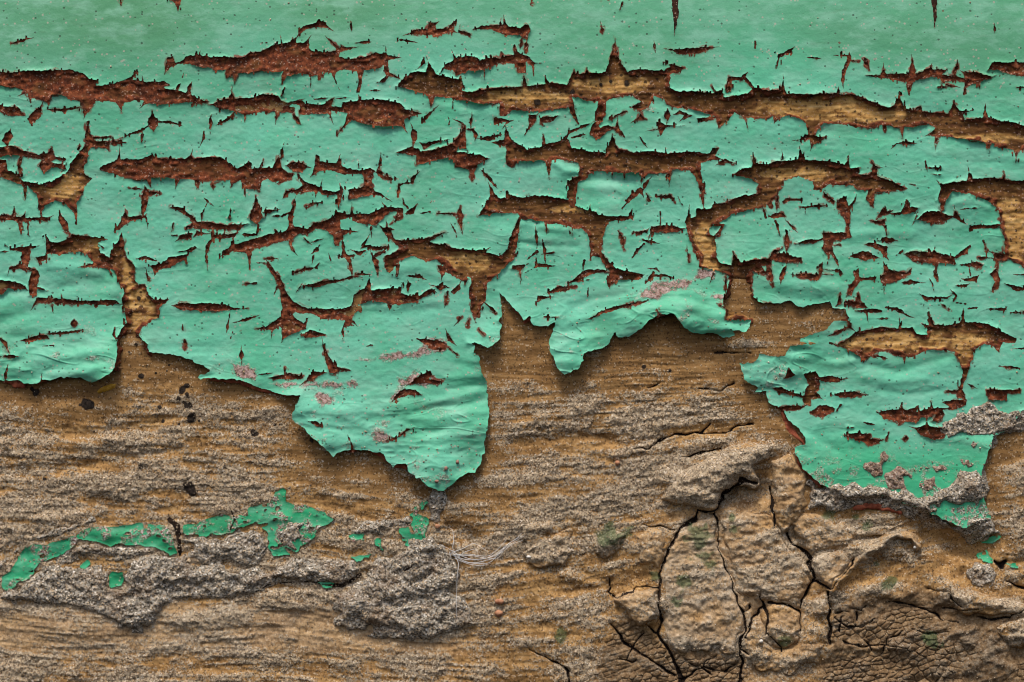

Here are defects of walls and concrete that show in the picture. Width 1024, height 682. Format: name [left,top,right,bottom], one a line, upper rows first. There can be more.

peeling [0,299,126,384]
peeling [523,280,751,374]
peeling [186,343,489,491]
crack [634,423,754,457]
peeling [740,346,1024,528]
crack [608,477,1024,682]